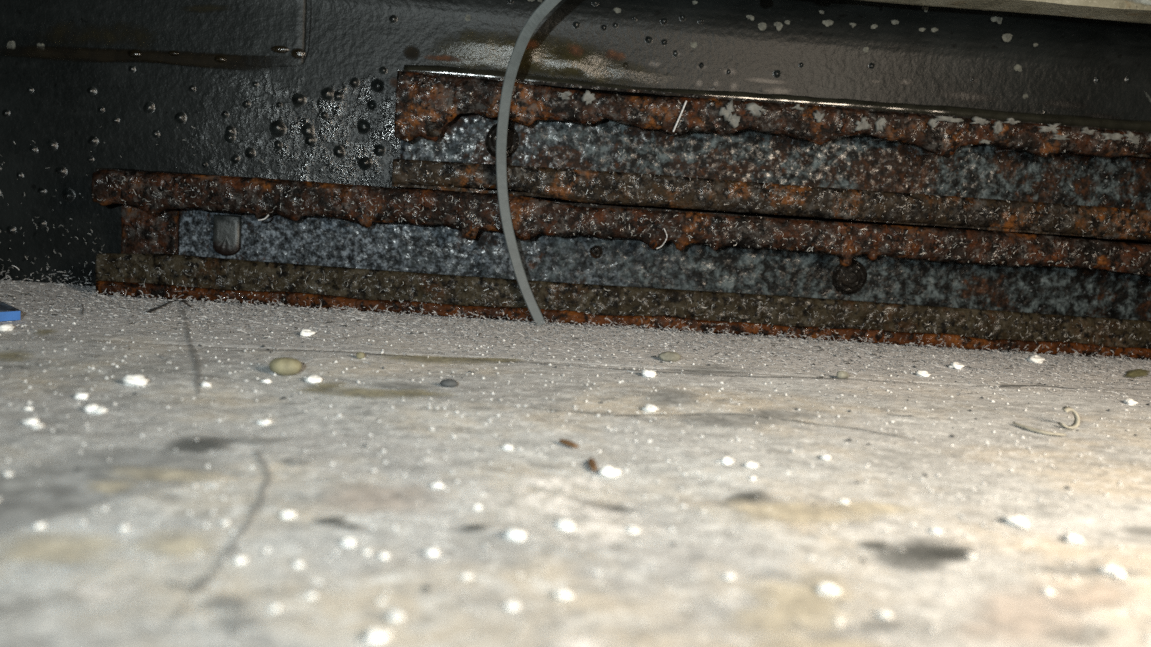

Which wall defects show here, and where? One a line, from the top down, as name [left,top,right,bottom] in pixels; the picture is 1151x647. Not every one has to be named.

damp [404,33,624,82]
rust [394,71,1151,158]
rust [91,170,1151,276]
crack [147,299,192,313]
rust [96,280,1151,360]